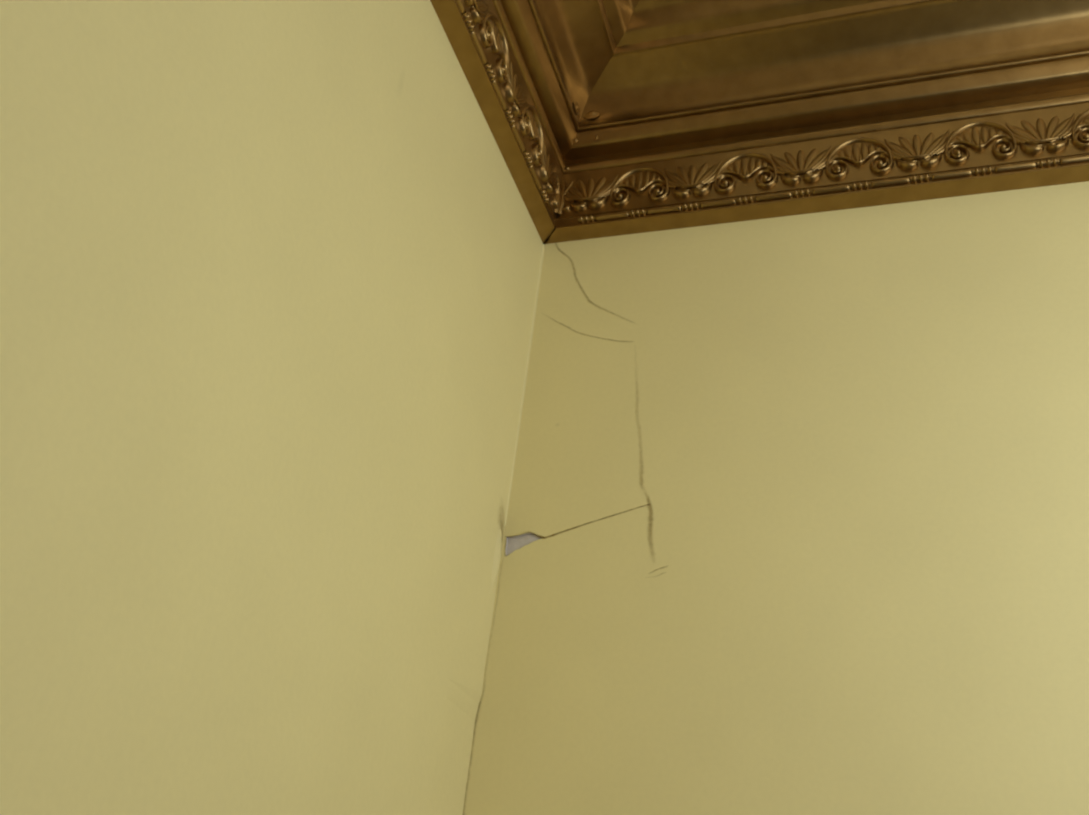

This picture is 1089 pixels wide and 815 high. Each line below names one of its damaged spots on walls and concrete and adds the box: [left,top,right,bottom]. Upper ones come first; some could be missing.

crack [542,504,650,538]
flaking render [505,530,543,556]